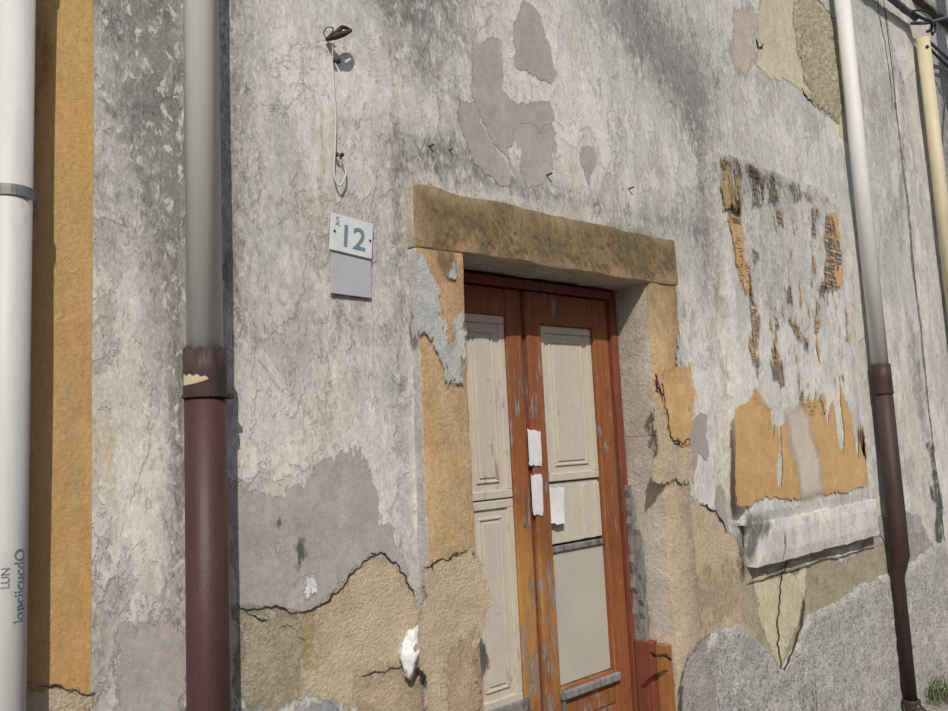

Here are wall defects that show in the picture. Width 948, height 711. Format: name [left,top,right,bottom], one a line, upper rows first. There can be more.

peeling [457,0,557,189]
flaking render [730,0,848,141]
peeling [407,252,467,386]
crack [877,0,945,540]
peeling [625,155,890,711]
water stain [927,442,944,543]
flaking render [26,682,101,711]
peeling [109,617,186,711]
crack [237,550,467,639]
flaking render [228,445,493,711]
crack [363,666,424,711]
crack [753,532,879,669]